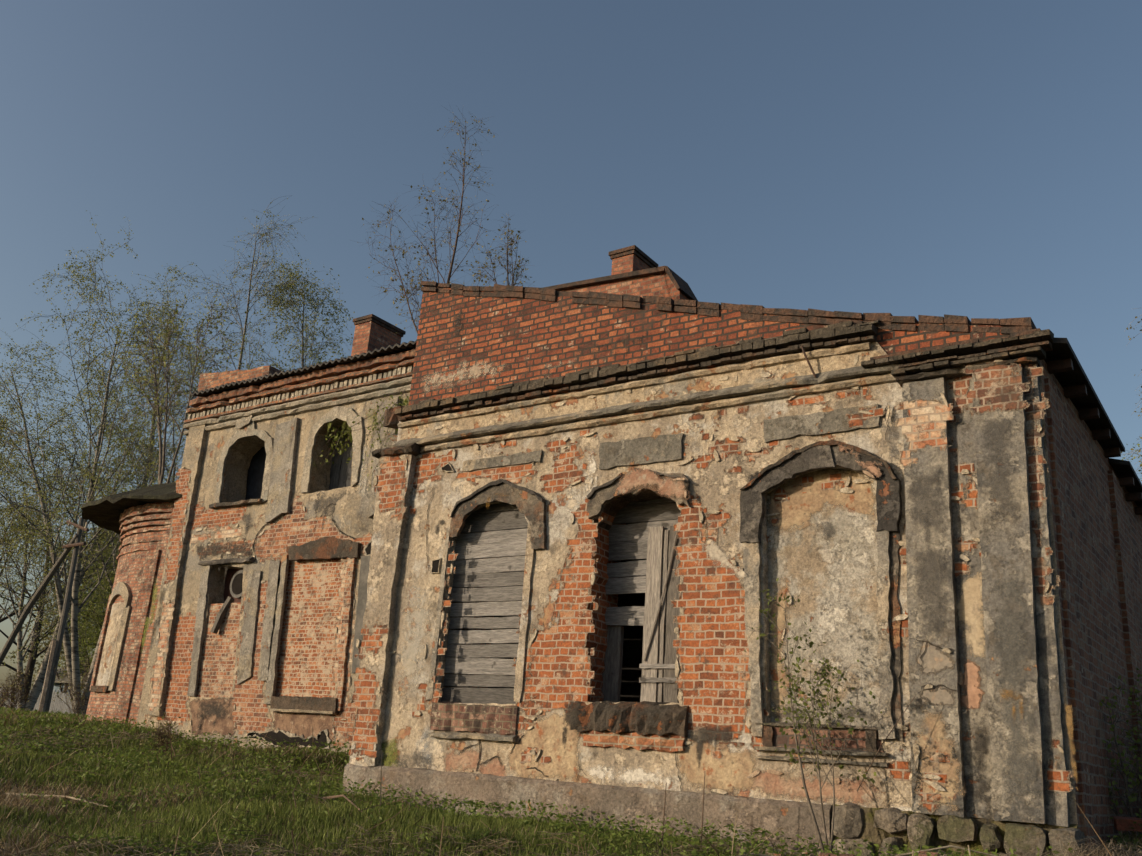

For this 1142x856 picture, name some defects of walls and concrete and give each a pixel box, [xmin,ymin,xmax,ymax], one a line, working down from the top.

spalling [148,465,459,762]
spalling [373,416,599,519]
spalling [445,497,603,782]
spalling [617,405,882,806]
spalling [786,359,1060,605]
damp [910,470,946,632]
peeling [882,537,985,813]
damp [984,420,1016,520]